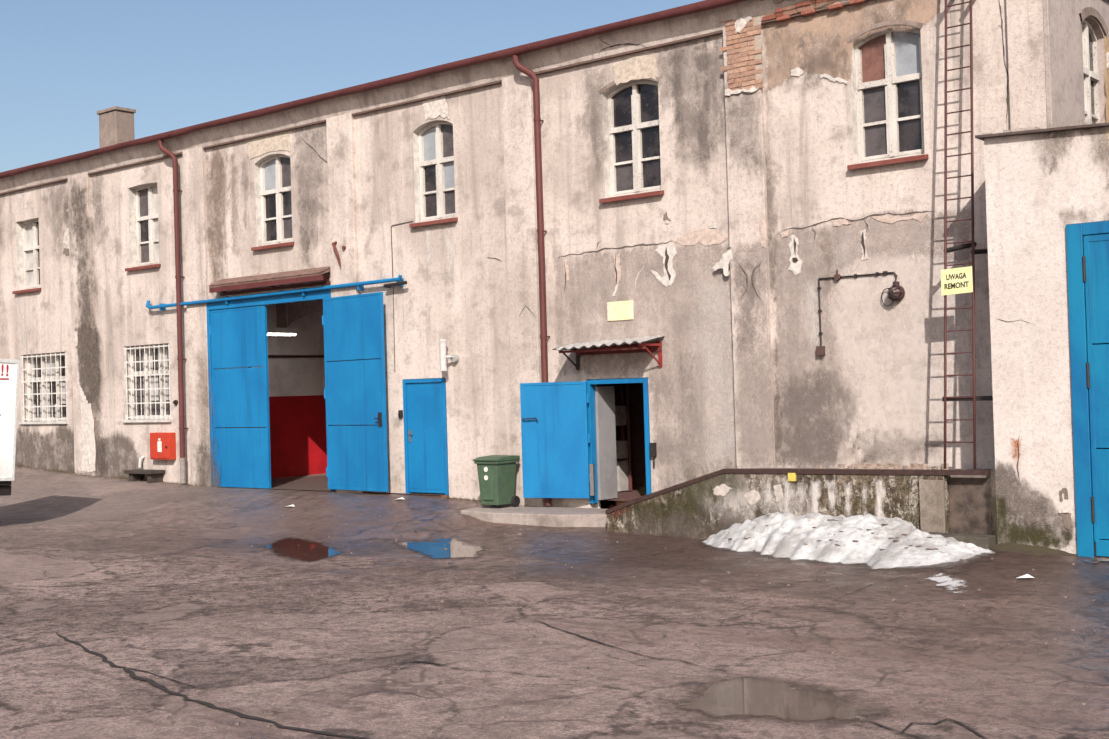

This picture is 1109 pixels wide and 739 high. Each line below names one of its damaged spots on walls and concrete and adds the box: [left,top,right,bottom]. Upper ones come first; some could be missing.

flaking render [719,0,940,96]
crack [999,2,1009,118]
damp [72,186,99,352]
flaking render [650,224,733,287]
flaking render [759,218,767,248]
flaking render [780,230,803,275]
crack [776,211,931,240]
flaking render [872,213,927,224]
damp [15,425,75,473]
damp [91,393,140,479]
damp [638,481,885,539]
damp [990,464,1073,544]